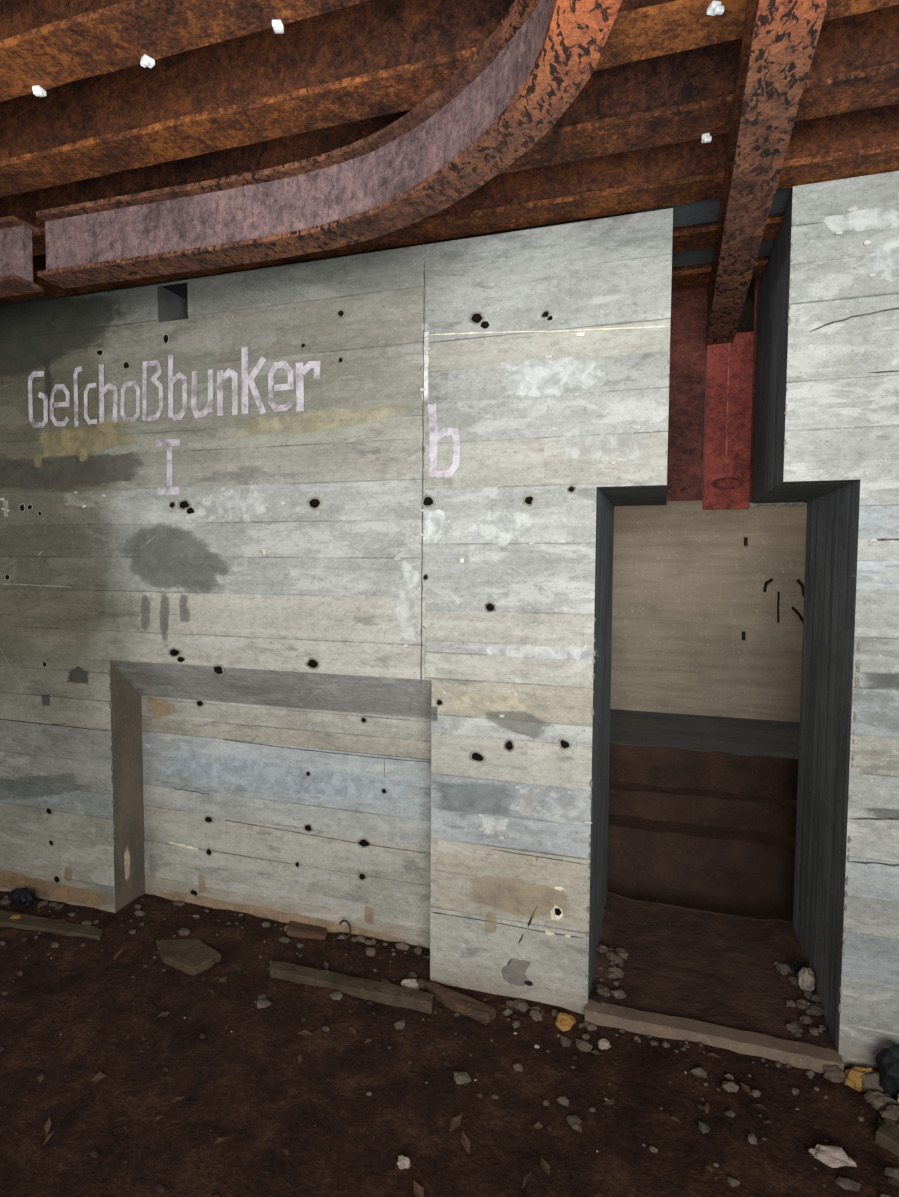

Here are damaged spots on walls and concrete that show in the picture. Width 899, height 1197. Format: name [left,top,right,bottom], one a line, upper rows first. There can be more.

crack [852,814,899,822]
crack [849,860,899,868]